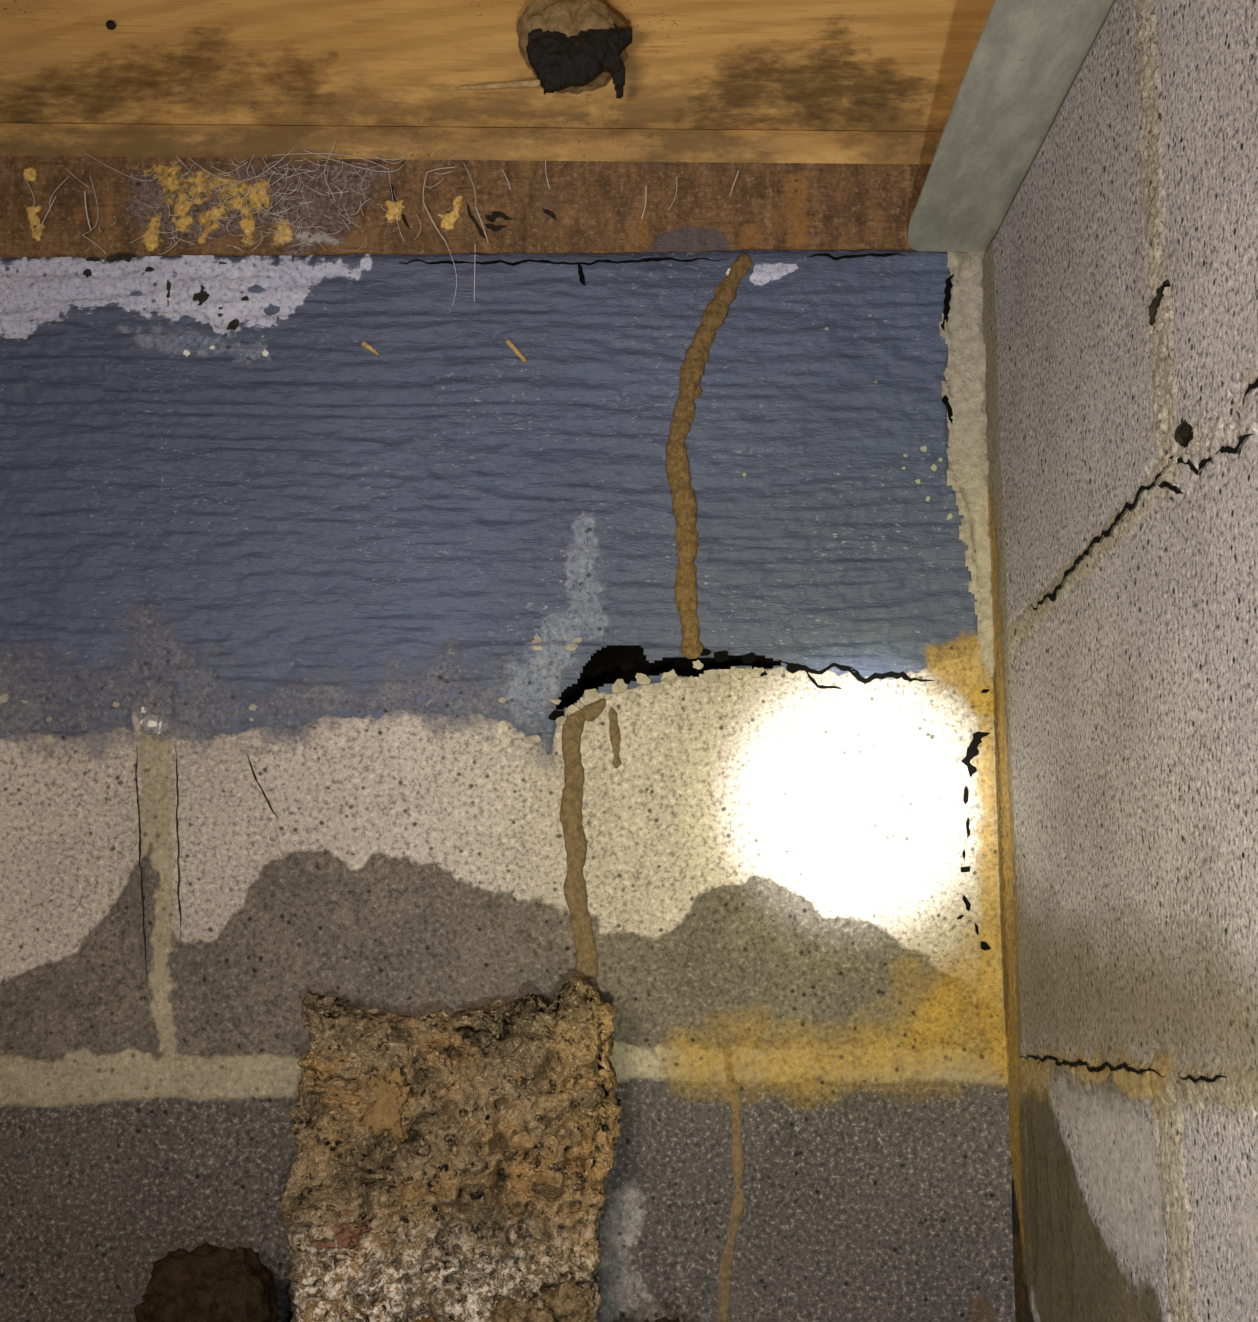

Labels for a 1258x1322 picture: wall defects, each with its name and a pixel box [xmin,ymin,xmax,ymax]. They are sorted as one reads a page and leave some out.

peeling [0,253,372,362]
crack [1243,377,1258,399]
crack [1028,434,1252,611]
crack [777,659,935,689]
leakage [0,849,161,1061]
leakage [168,850,1006,1058]
crack [1020,1055,1227,1083]
leakage [1009,1083,1162,1322]